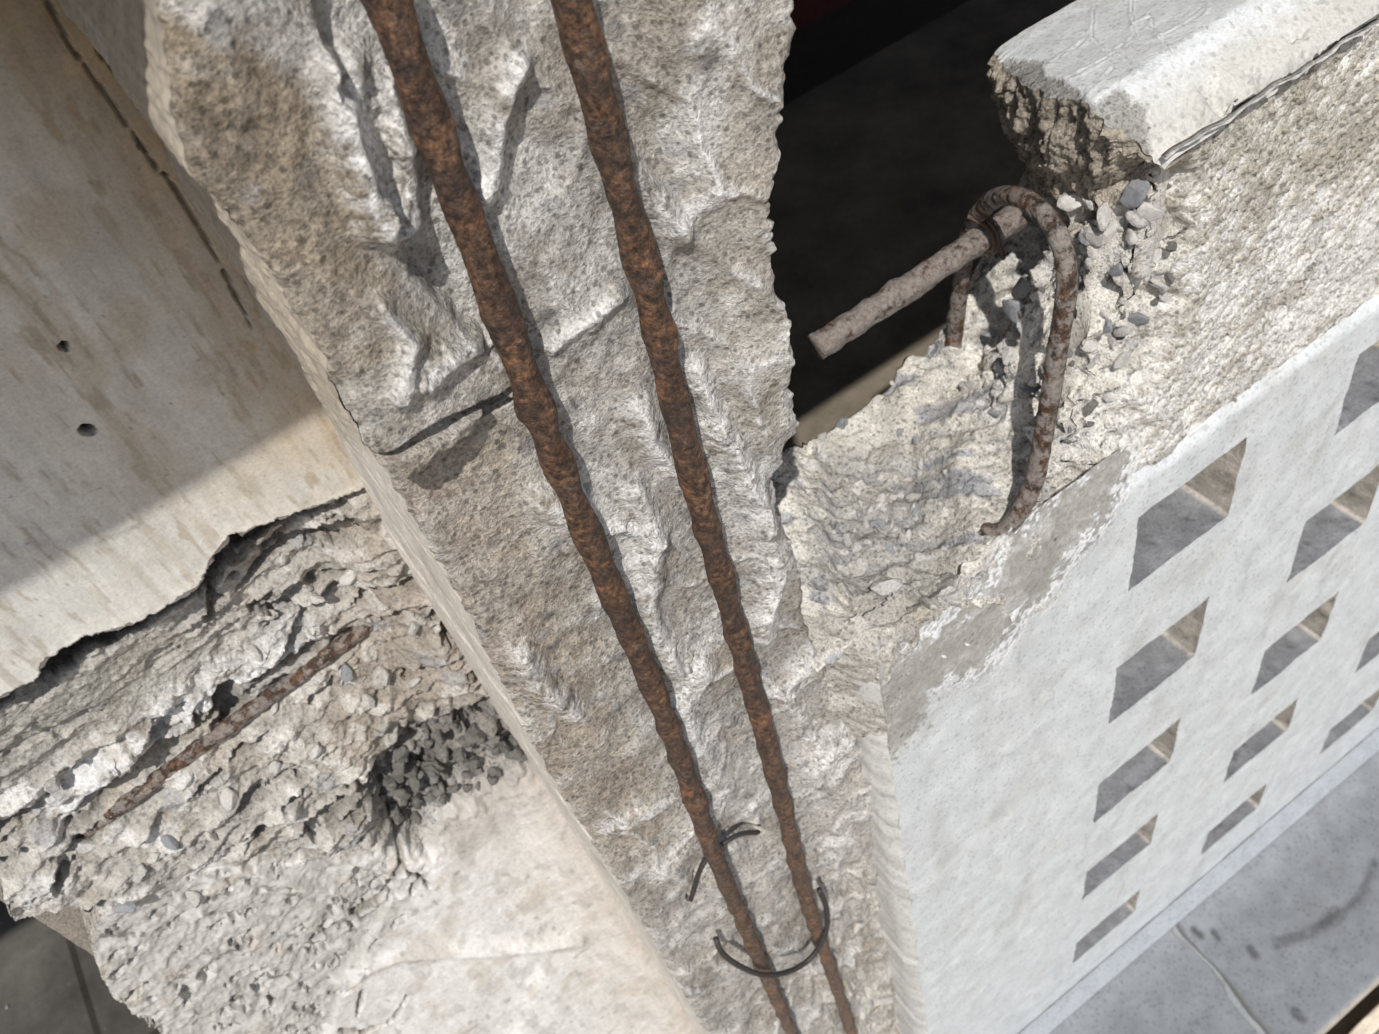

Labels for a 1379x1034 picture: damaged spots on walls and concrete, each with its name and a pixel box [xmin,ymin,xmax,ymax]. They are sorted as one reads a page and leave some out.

crack [1045,0,1214,98]
crack [1161,19,1379,160]
spalling [0,489,490,1034]
spalling [153,0,1178,1034]